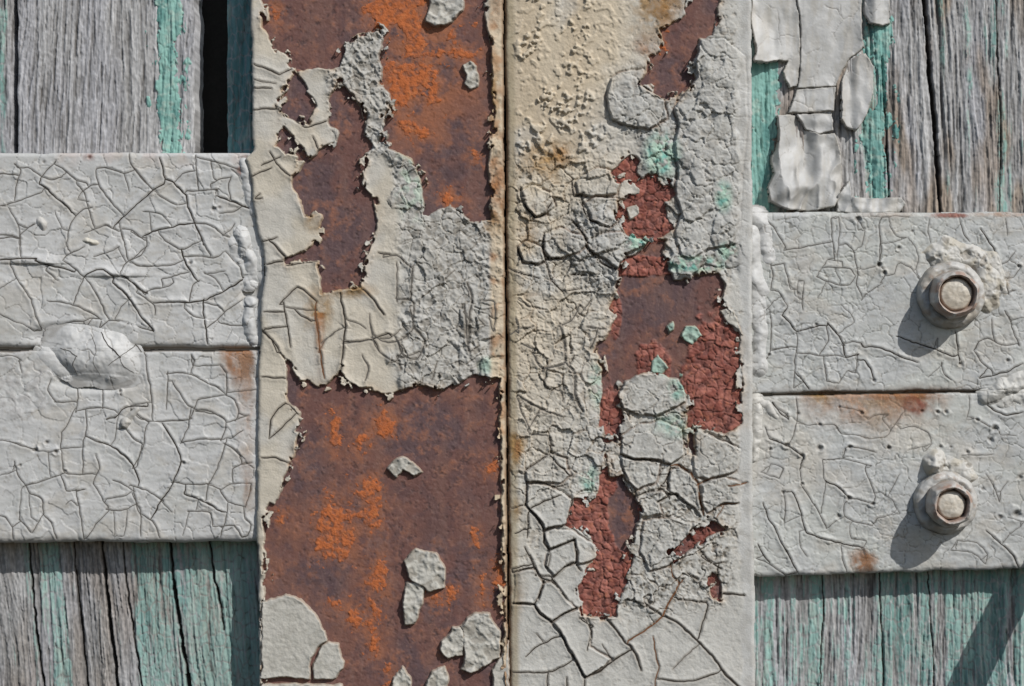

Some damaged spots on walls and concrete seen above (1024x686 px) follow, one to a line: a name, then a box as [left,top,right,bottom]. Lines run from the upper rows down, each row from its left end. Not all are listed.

crack [250,64,326,149]
peeling [260,0,496,293]
peeling [637,0,720,101]
peeling [751,0,906,213]
crack [0,153,437,686]
peeling [259,360,511,686]
crack [443,181,745,686]
peeling [565,156,743,620]
crack [620,0,1024,685]